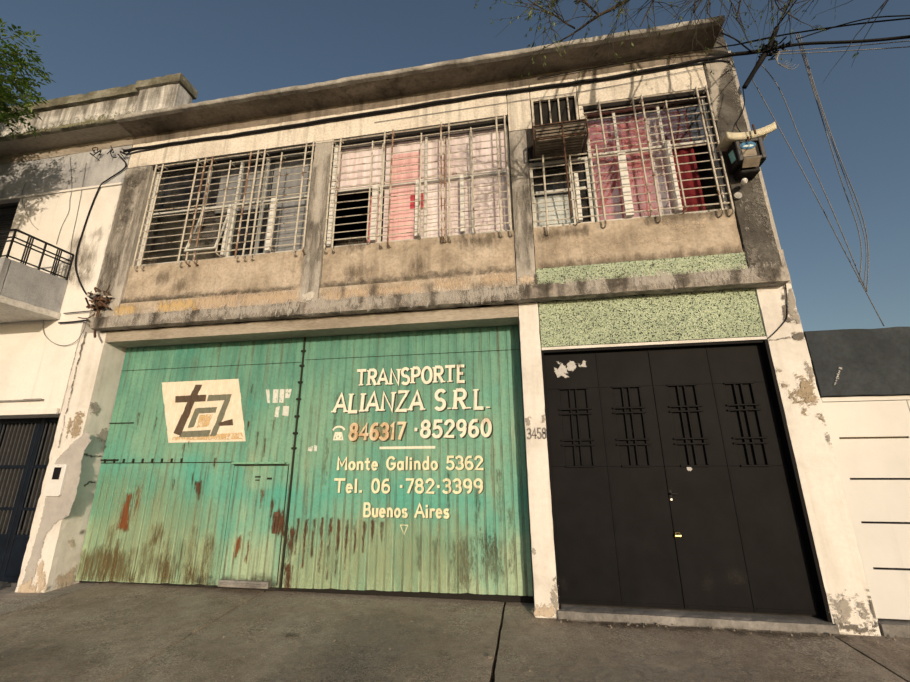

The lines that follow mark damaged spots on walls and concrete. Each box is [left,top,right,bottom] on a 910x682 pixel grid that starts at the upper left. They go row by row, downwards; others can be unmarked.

damp [324,260,424,301]
damp [516,281,552,299]
peeling [554,360,587,378]
peeling [65,402,101,438]
peeling [776,362,833,448]
corrosion [79,489,213,583]
corrosion [260,491,383,590]
peeling [17,561,76,593]
peeling [840,590,878,634]